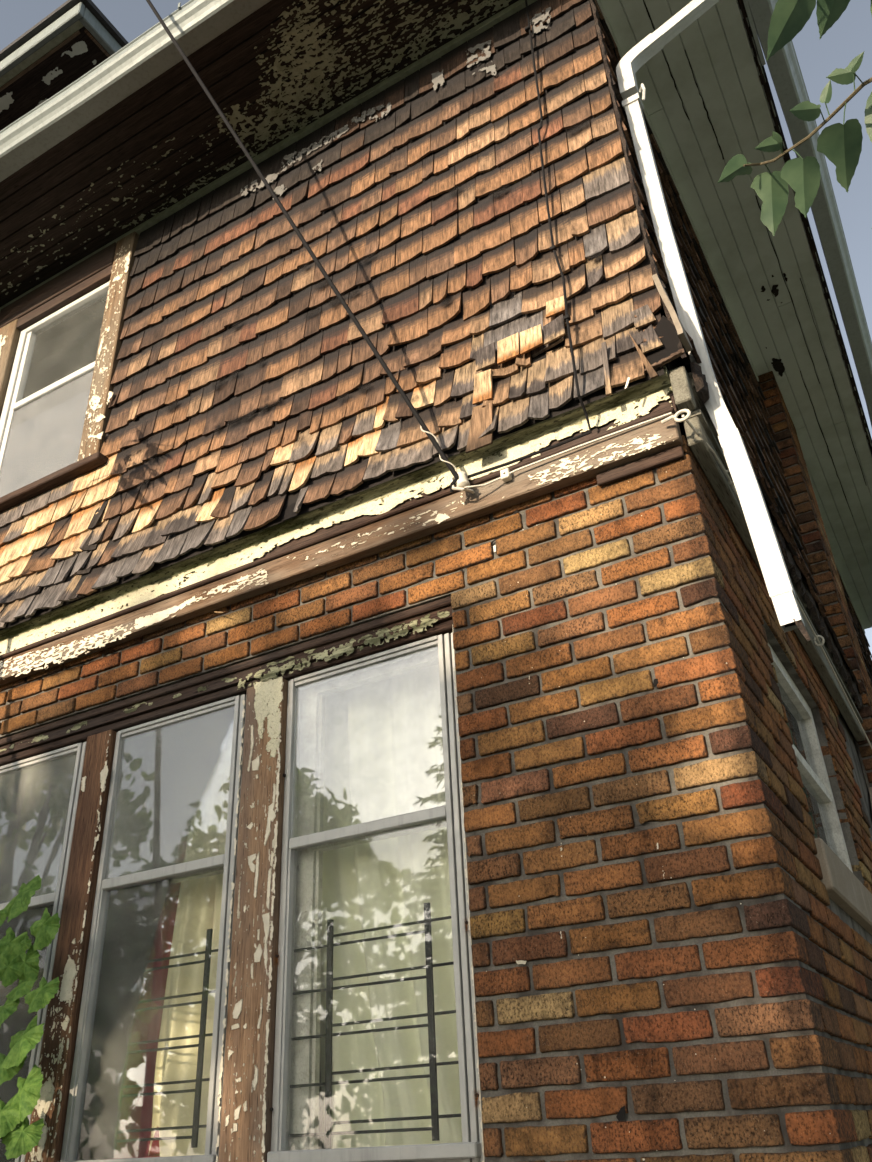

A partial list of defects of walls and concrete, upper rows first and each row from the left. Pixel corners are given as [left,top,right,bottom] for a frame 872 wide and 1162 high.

peeling [530,7,551,35]
peeling [0,0,511,295]
peeling [78,244,131,461]
peeling [0,389,673,680]
peeling [0,734,49,752]
peeling [81,765,108,851]
peeling [216,611,450,1162]
peeling [28,910,86,1162]